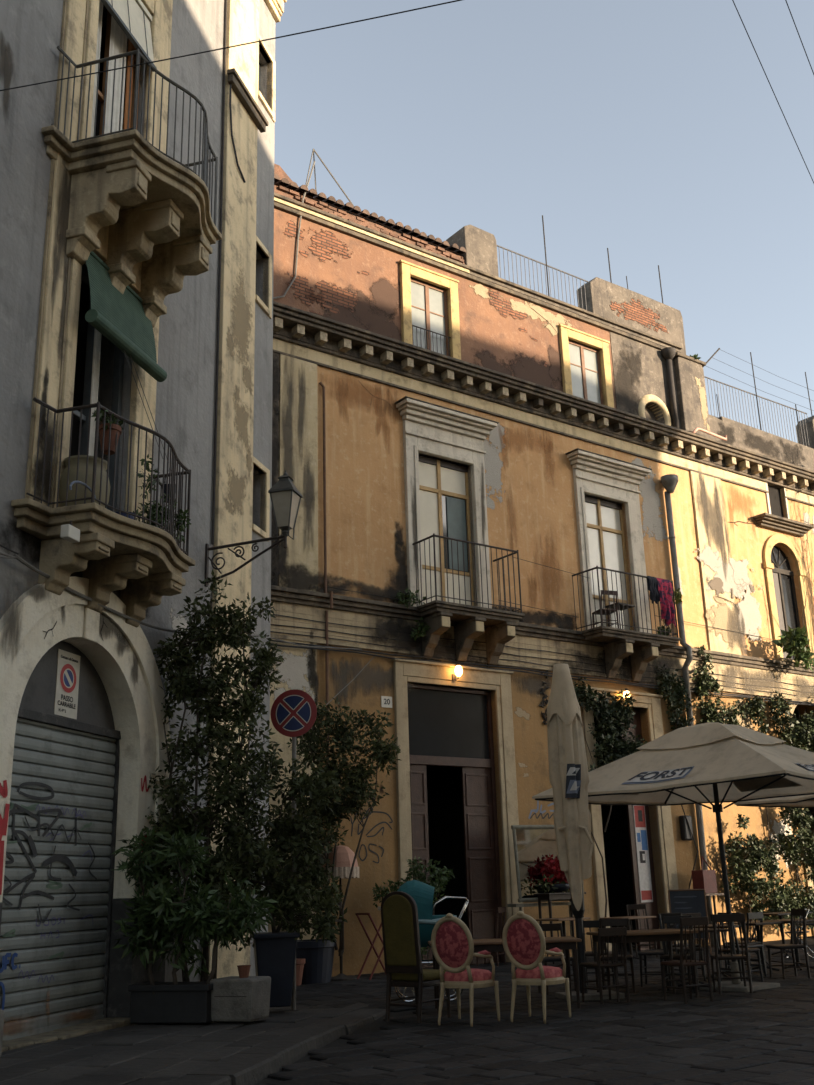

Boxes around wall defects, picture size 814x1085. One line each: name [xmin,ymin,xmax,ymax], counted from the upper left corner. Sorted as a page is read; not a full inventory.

leakage [0,36,13,112]
spalling [283,221,352,263]
spalling [285,271,359,314]
peeling [469,283,574,342]
spalling [610,295,669,334]
leakage [612,347,641,415]
leakage [272,365,314,537]
peeling [483,422,506,510]
peeling [631,457,668,543]
leakage [271,493,418,605]
peeling [695,544,763,642]
leakage [372,614,498,668]